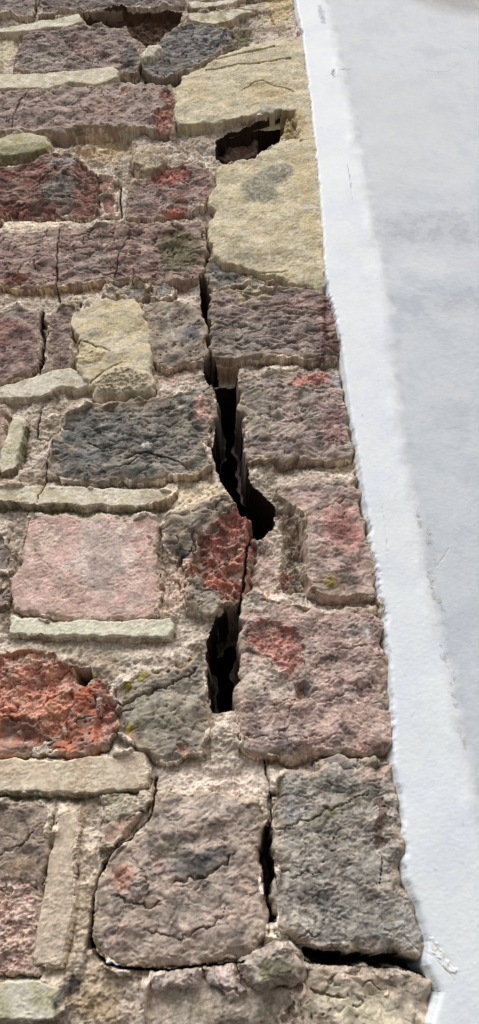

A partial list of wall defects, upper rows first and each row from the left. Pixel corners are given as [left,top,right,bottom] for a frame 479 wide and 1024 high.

crack [199,260,276,713]
crack [257,761,278,924]